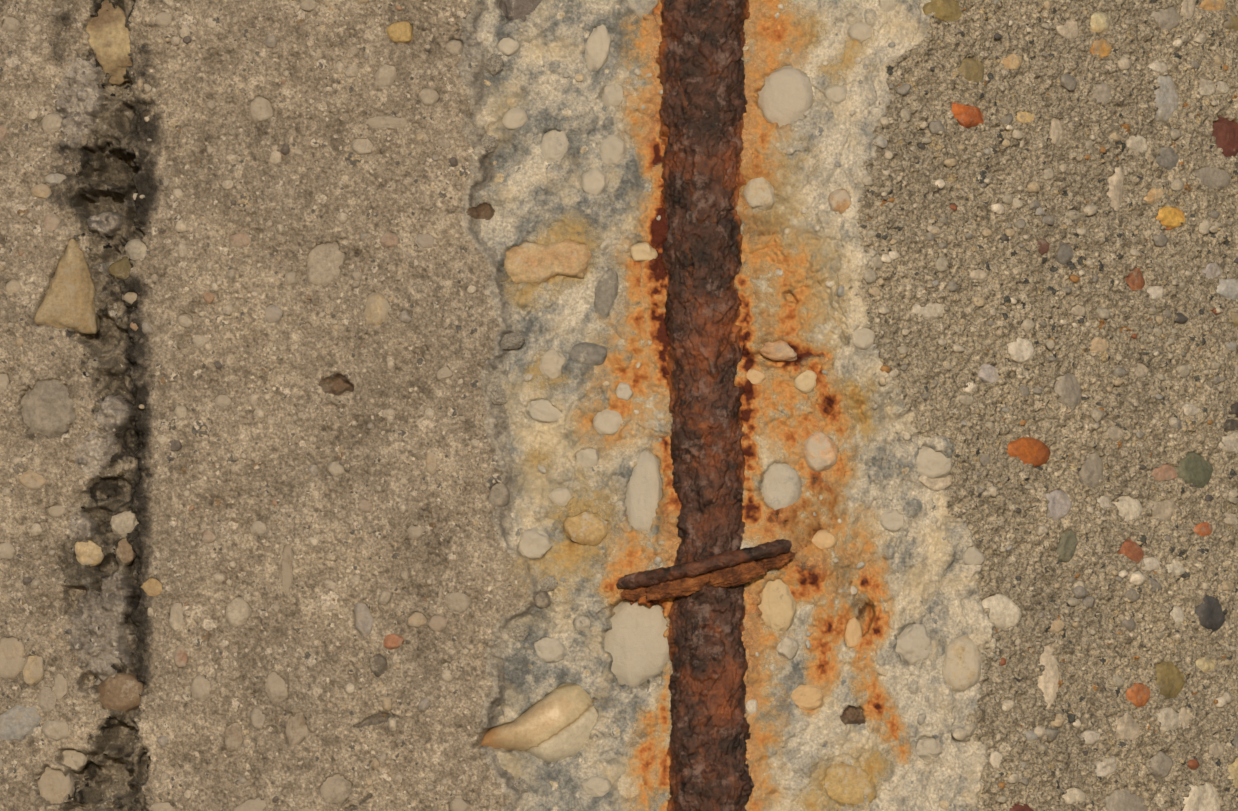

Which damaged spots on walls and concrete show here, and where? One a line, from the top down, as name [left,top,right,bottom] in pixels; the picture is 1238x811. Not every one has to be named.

crack [52,0,154,811]
spalling [458,0,999,811]
corrosion [574,0,911,811]